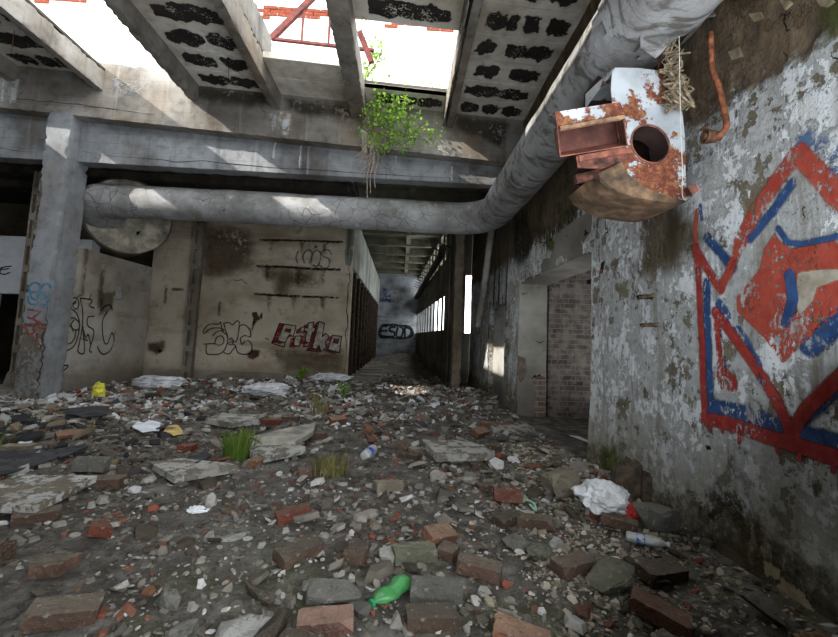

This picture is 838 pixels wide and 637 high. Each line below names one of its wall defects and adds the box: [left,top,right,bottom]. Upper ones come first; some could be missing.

peeling [728,47,743,60]